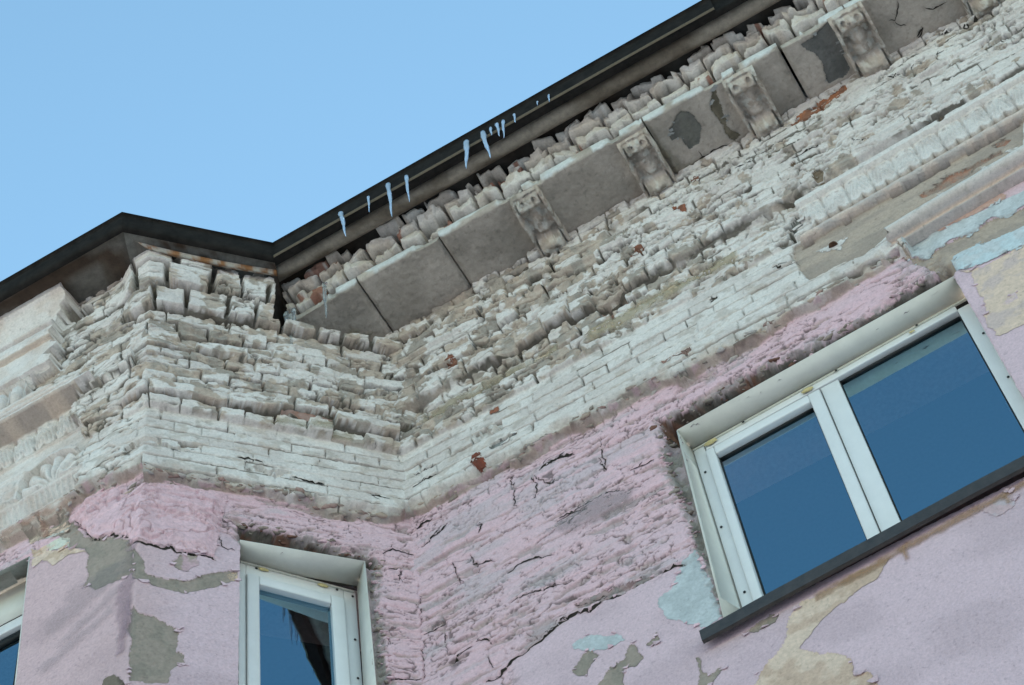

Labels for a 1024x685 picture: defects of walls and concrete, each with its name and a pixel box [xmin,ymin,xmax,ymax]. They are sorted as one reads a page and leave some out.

crack [888,1,992,78]
peeling [667,111,702,149]
flaking render [790,85,848,126]
flaking render [920,137,1011,198]
peeling [797,198,1024,336]
flaking render [470,431,557,473]
crack [510,439,653,523]
peeling [649,387,728,629]
peeling [102,606,189,685]
crack [379,519,683,682]
peeling [572,631,661,685]
peeling [741,560,888,685]